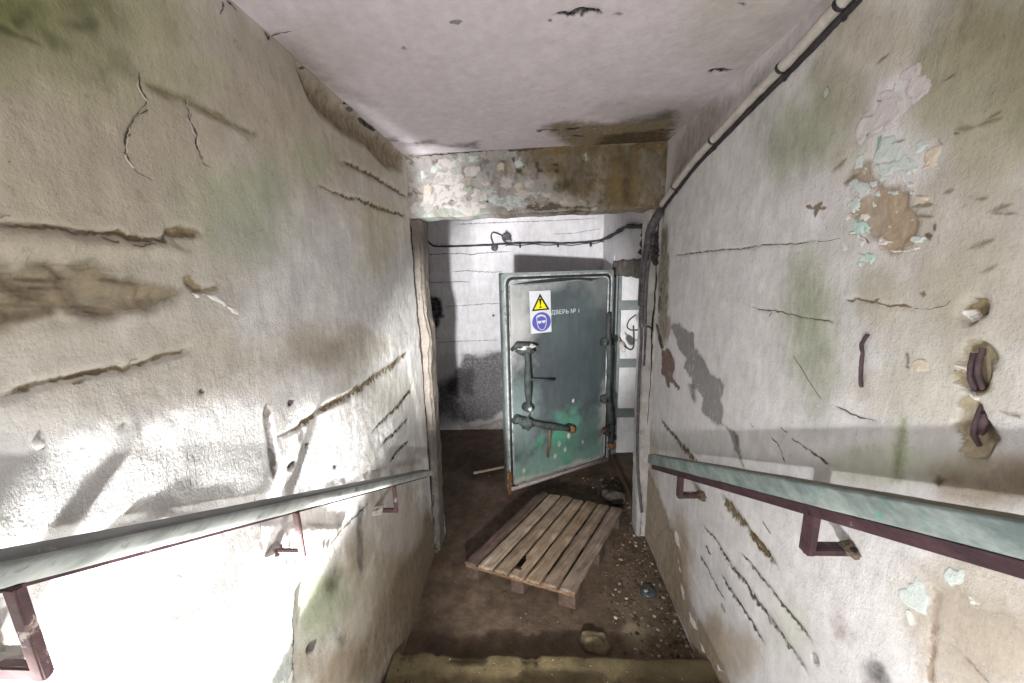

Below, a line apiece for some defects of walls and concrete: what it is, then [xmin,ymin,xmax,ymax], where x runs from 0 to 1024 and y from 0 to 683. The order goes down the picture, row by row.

spalling [549,7,601,21]
crack [0,215,166,247]
peeling [409,155,591,216]
water stain [537,112,674,203]
peeling [838,62,942,267]
crack [12,351,181,393]
spalling [0,263,239,326]
crack [277,162,502,530]
water stain [659,231,738,452]
crack [647,234,873,465]
spalling [952,340,1000,459]
crack [701,496,813,675]